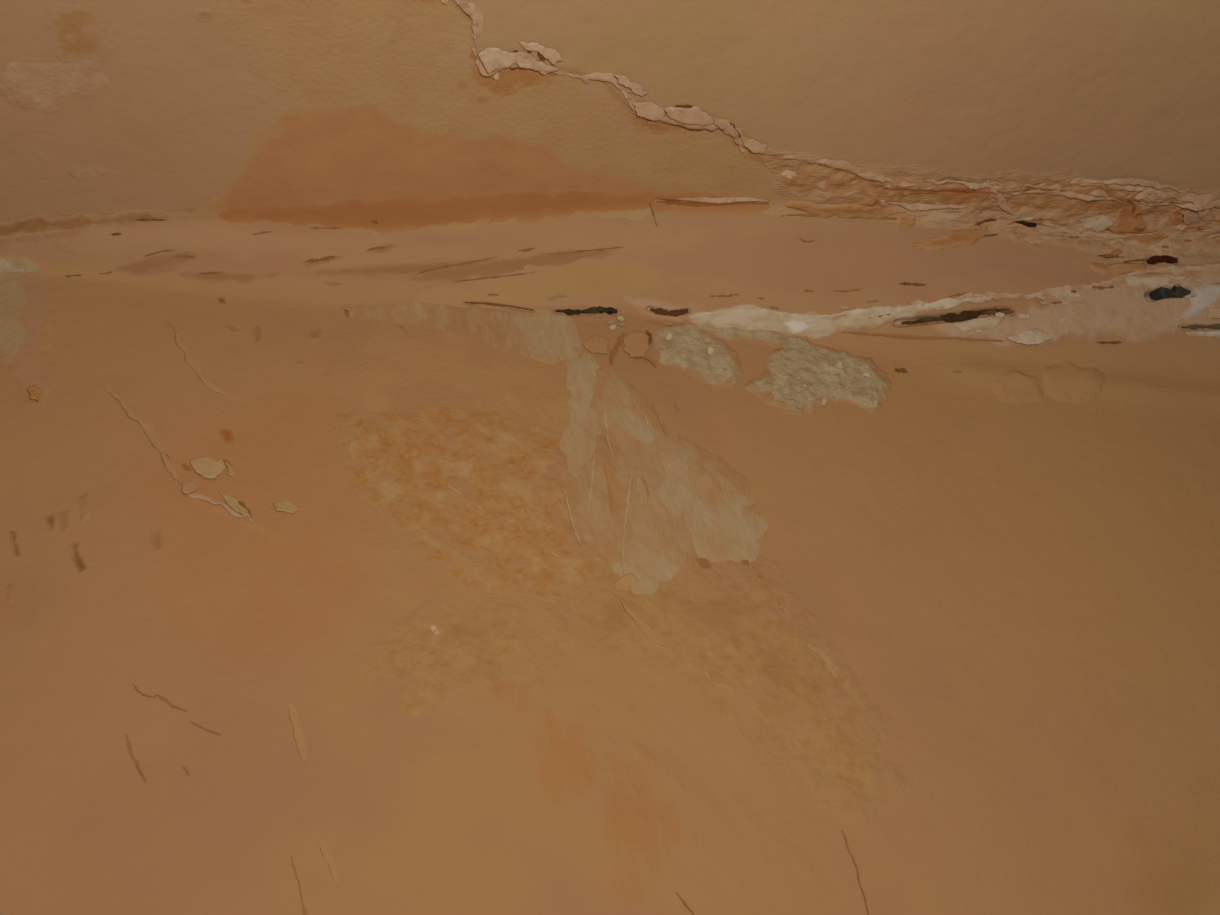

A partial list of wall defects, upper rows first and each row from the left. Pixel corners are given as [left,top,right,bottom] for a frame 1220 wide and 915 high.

damp [0,2,123,114]
flaking render [405,0,1220,416]
damp [52,102,1093,594]
damp [93,365,466,685]
crack [126,734,147,781]
crack [133,684,221,735]
crack [842,830,869,915]